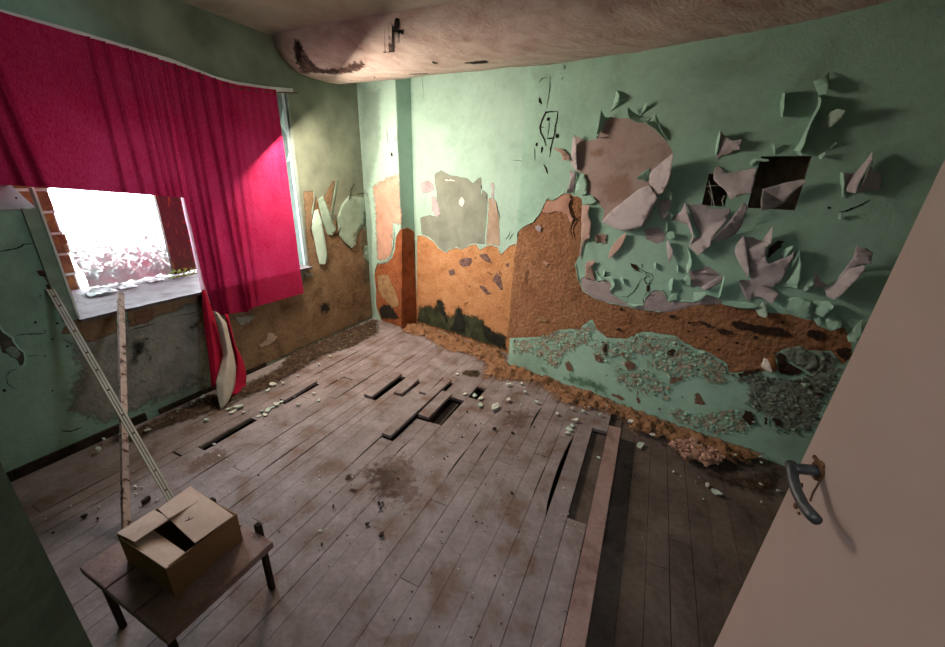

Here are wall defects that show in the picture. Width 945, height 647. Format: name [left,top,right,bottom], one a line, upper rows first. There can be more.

hole [748,156,811,210]
spalling [228,170,852,435]
spalling [0,326,27,367]
mould [133,338,152,363]